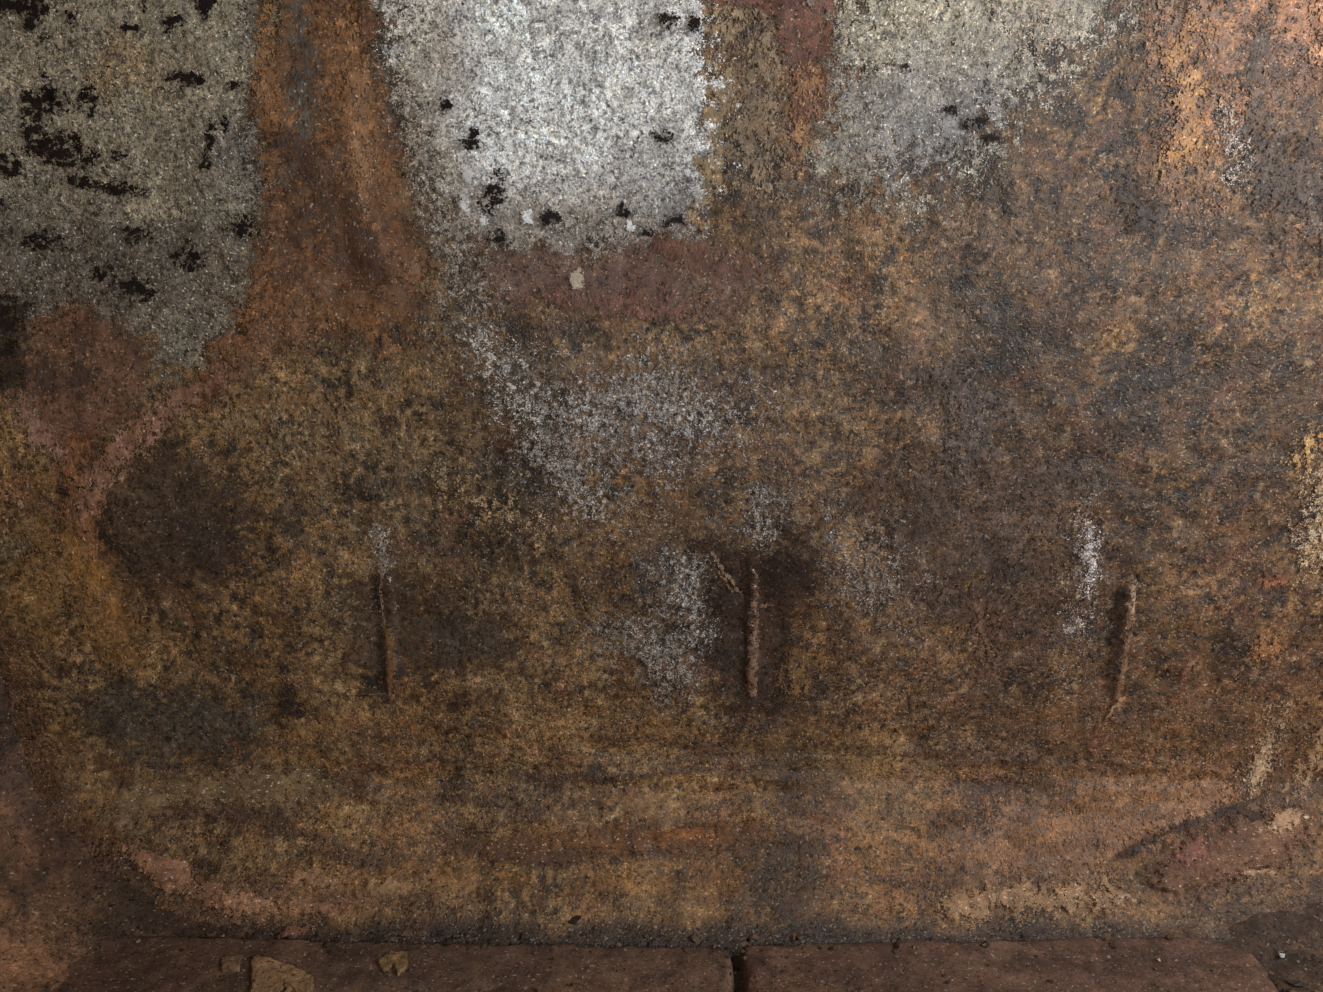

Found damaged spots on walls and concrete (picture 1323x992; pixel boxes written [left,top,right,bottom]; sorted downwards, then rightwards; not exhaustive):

leakage [190,366,368,456]
rust [0,0,844,697]
leakage [368,31,1030,733]
leakage [361,515,407,582]
leakage [1045,487,1117,705]
rust [1245,625,1291,671]
rust [1256,497,1323,593]
rust [913,732,1282,927]